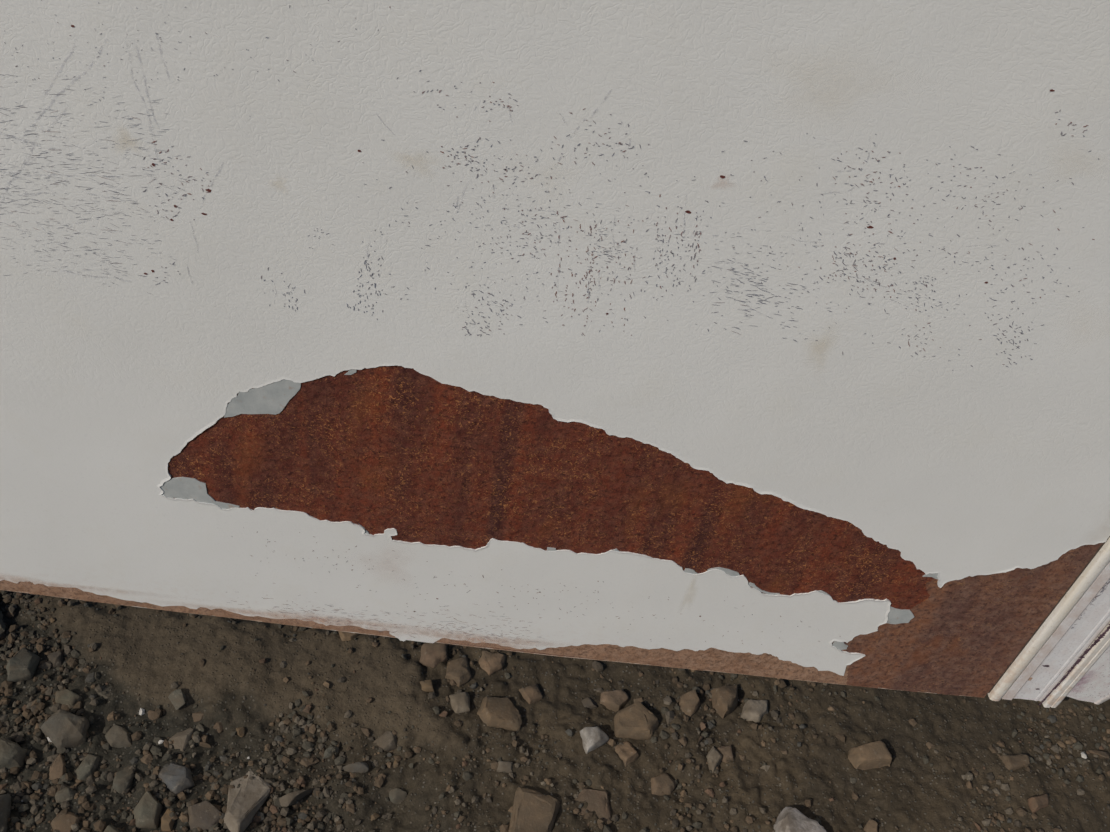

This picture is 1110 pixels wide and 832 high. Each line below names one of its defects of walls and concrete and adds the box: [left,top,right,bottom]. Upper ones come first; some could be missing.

corrosion [0,580,395,637]
peeling [156,363,1107,665]
corrosion [160,365,1103,698]